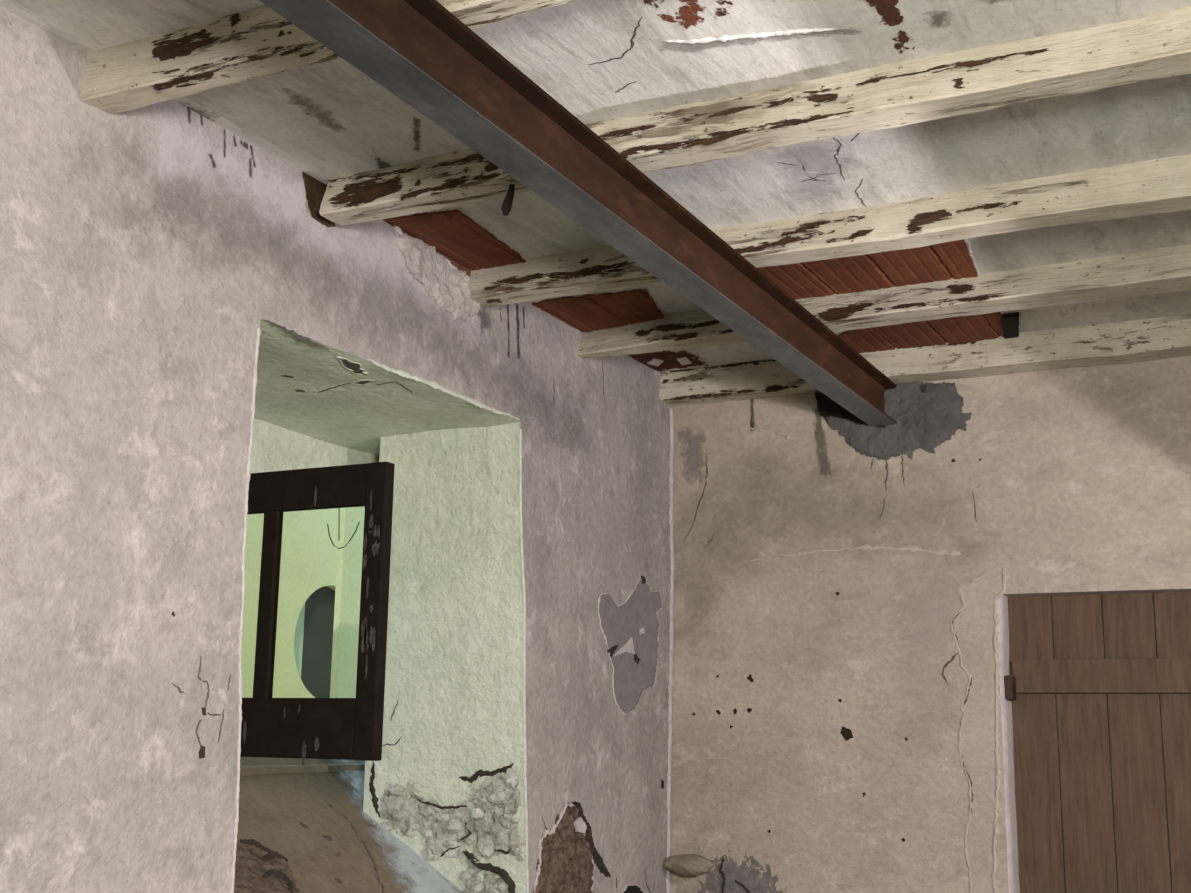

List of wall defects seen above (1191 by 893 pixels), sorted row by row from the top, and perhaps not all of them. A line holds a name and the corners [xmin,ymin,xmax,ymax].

peeling [152,13,325,93]
crack [589,18,642,93]
peeling [866,0,915,54]
peeling [302,156,501,227]
flaking render [385,207,632,307]
crack [777,133,866,206]
flaking render [757,239,1019,353]
peeling [906,201,1018,234]
flaking render [531,287,799,401]
crack [171,649,231,759]
spalling [377,763,527,893]
spalling [532,800,651,893]